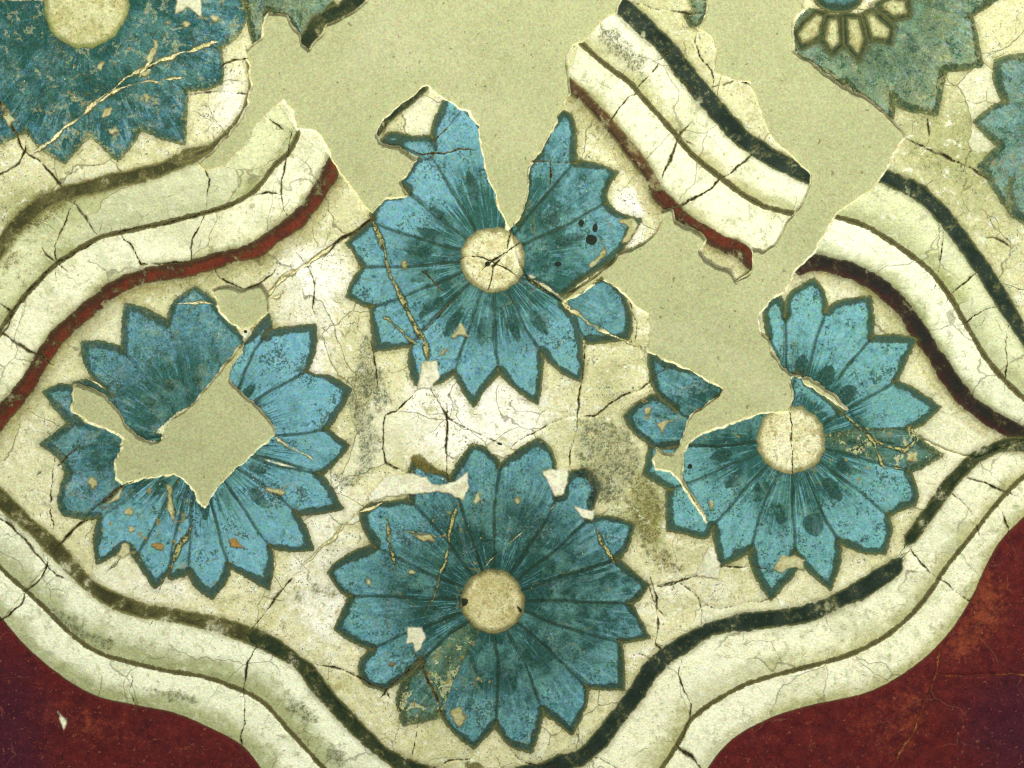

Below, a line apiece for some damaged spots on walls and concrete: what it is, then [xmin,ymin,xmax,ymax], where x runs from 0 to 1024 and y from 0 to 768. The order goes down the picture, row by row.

spalling [200,0,619,227]
crack [905,107,992,181]
spalling [214,285,268,333]
crack [0,40,666,479]
peeling [438,323,469,355]
spalling [566,0,904,488]
crack [935,232,980,302]
spalling [74,348,274,558]
damp [576,420,682,571]
crack [788,405,796,477]
crack [240,503,457,751]
crack [911,549,971,602]